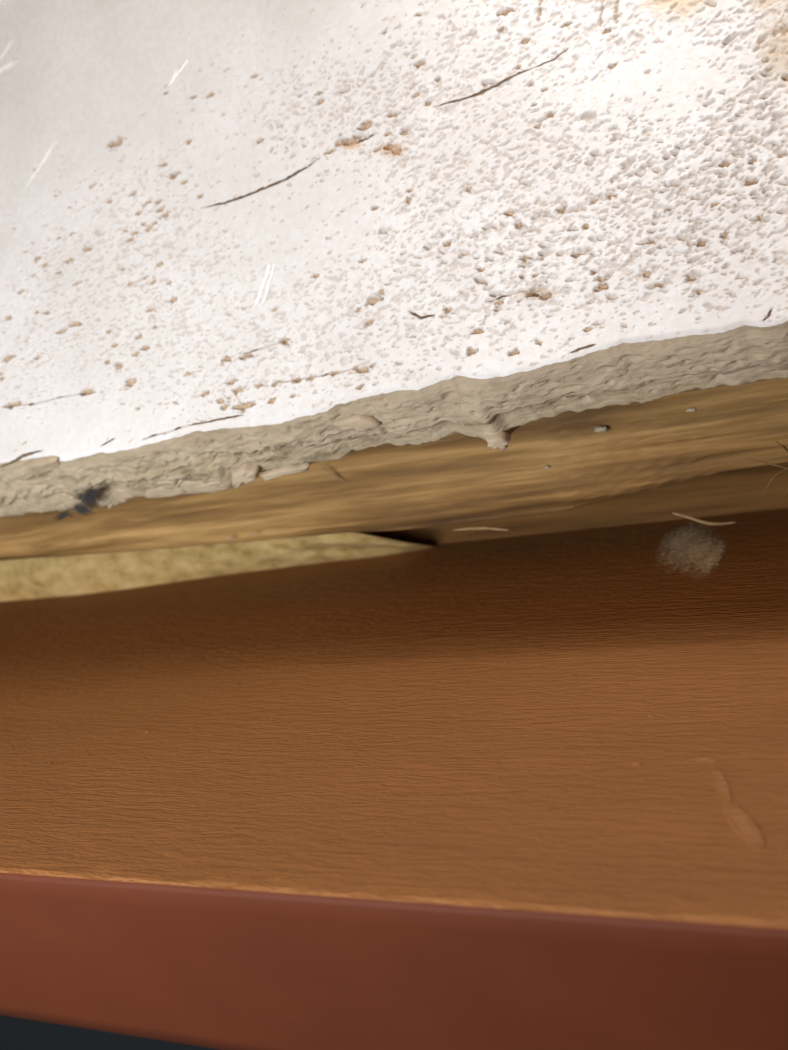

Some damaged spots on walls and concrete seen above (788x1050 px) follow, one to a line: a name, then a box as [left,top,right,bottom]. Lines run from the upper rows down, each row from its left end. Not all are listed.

crack [437,50,567,107]
crack [202,159,319,208]